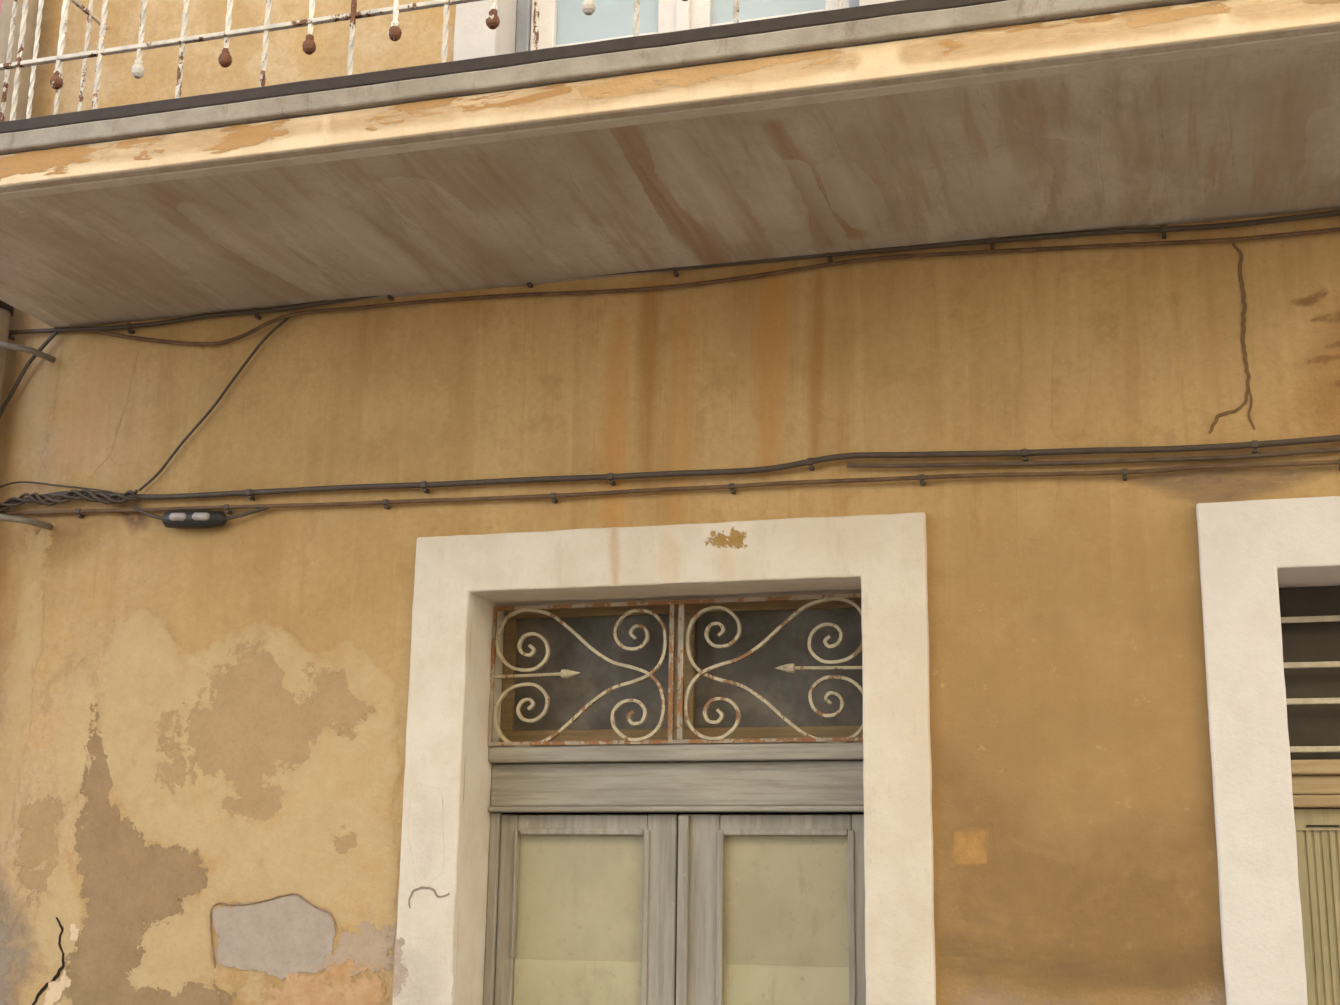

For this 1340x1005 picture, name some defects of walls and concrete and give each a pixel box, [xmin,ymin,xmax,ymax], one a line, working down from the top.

peeling [0,135,165,179]
peeling [201,119,290,154]
leakage [1224,51,1340,191]
crack [1209,243,1255,434]
peeling [41,333,142,487]
peeling [0,522,404,1005]
crack [32,917,80,1005]